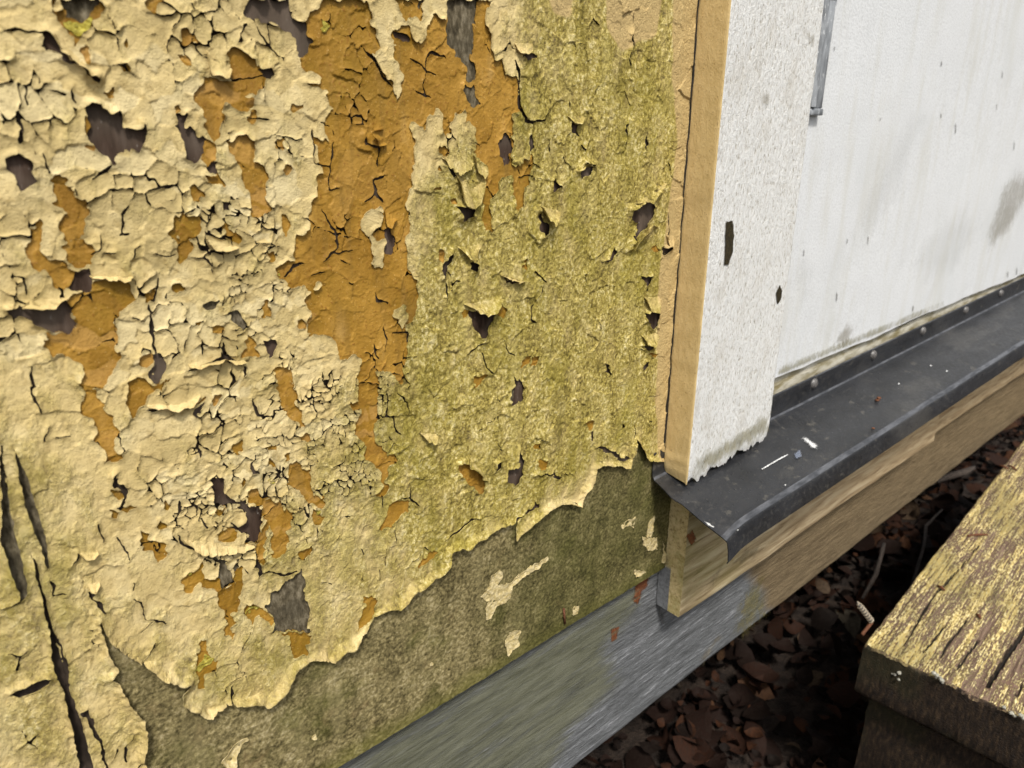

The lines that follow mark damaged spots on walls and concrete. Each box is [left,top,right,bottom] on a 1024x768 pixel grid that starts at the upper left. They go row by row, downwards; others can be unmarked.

crack [2,26,41,34]
crack [15,73,76,174]
crack [92,165,112,180]
crack [153,182,178,190]
crack [284,130,353,277]
crack [364,152,385,203]
crack [91,205,175,353]
crack [29,366,70,442]
crack [147,342,247,412]
crack [252,398,284,420]
peeling [0,0,675,768]
crack [50,581,106,615]